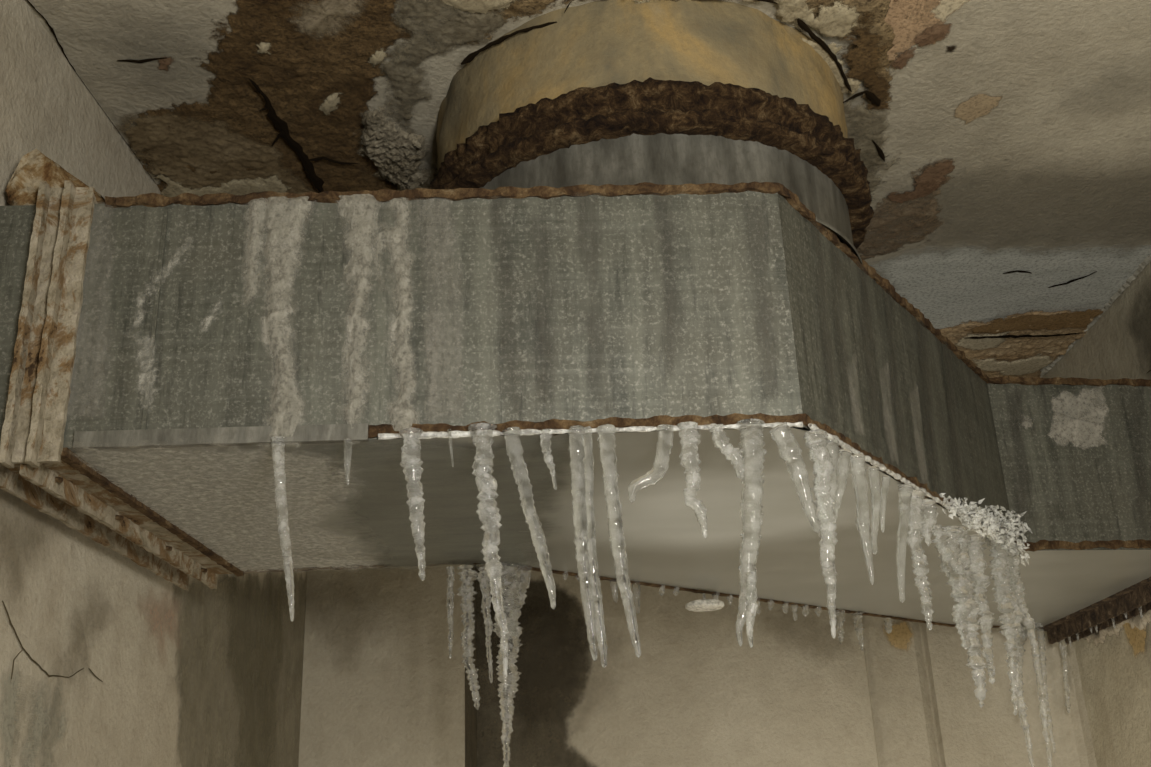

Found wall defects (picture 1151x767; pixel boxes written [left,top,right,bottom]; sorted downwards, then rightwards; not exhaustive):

crack [249,78,359,193]
flaking render [119,0,583,197]
flaking render [743,0,970,260]
flaking render [940,309,1103,378]
corrosion [61,447,244,577]
crack [2,601,103,682]
water stain [174,572,307,767]